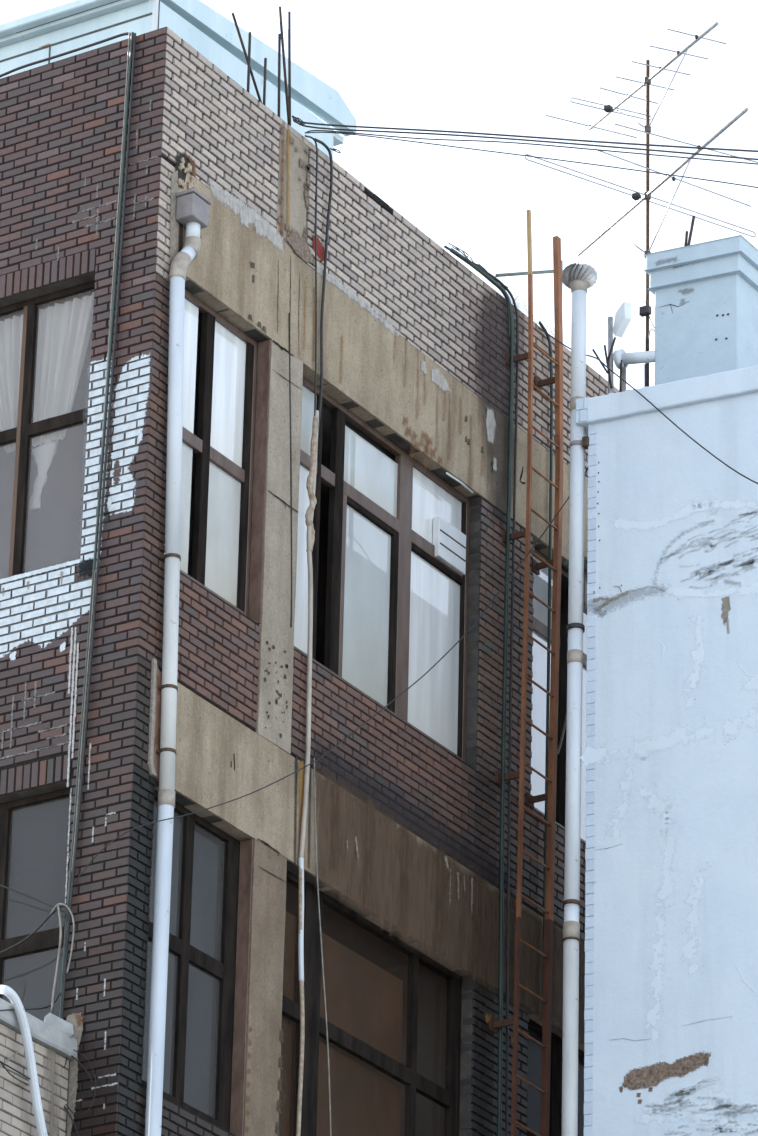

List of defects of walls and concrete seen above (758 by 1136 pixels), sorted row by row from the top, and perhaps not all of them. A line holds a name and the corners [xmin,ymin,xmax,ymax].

peeling [0,353,152,660]
water stain [315,767,563,1033]
flaking render [619,1052,711,1104]